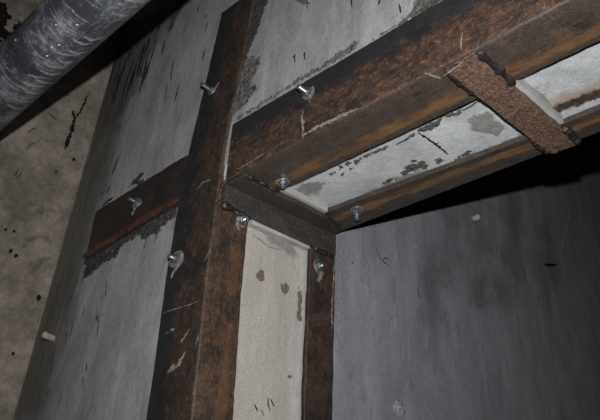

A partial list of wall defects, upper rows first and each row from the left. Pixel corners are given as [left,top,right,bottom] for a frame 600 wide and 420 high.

rust [552,89,600,113]
crack [64,94,89,150]
damp [469,111,504,135]
crack [418,132,448,154]
peeling [382,158,443,184]
spalling [81,208,177,284]